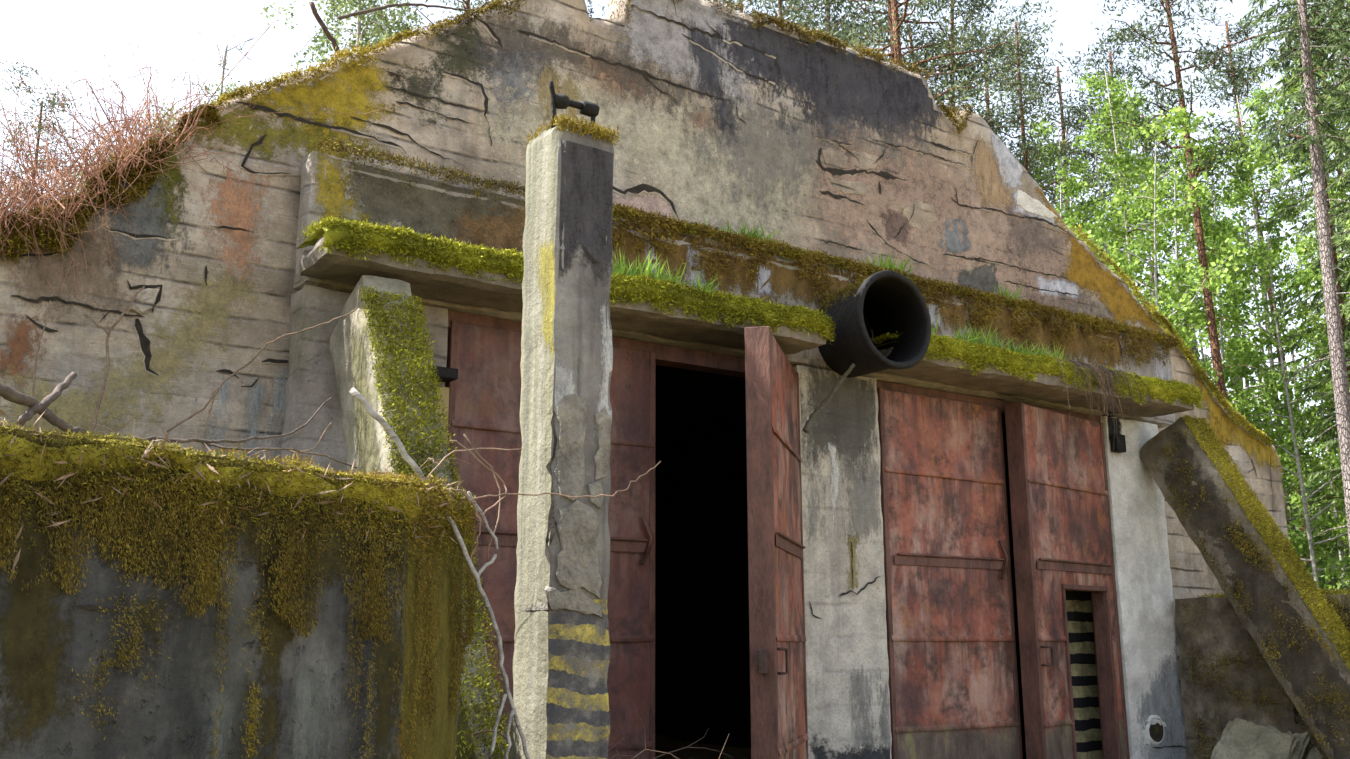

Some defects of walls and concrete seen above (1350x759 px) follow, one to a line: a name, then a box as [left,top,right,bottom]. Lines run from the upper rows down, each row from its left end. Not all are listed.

crack [18,250,61,258]
crack [11,280,162,377]
crack [613,183,678,221]
damp [474,8,1171,380]
crack [815,136,1084,339]
spalling [520,394,612,618]